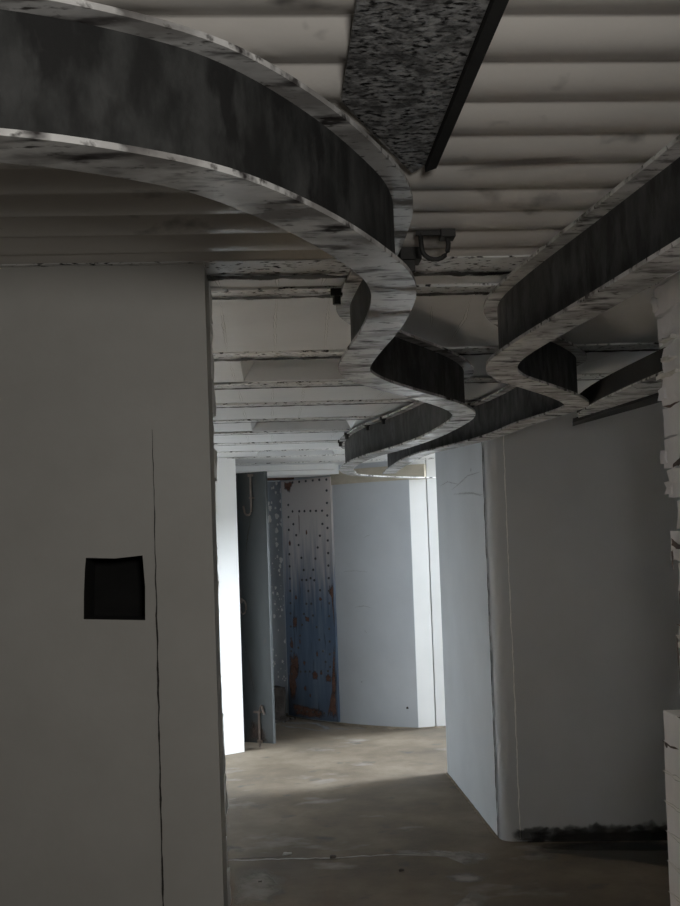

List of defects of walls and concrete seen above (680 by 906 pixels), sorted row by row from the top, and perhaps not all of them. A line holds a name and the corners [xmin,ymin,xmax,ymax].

rust [289,640,337,718]